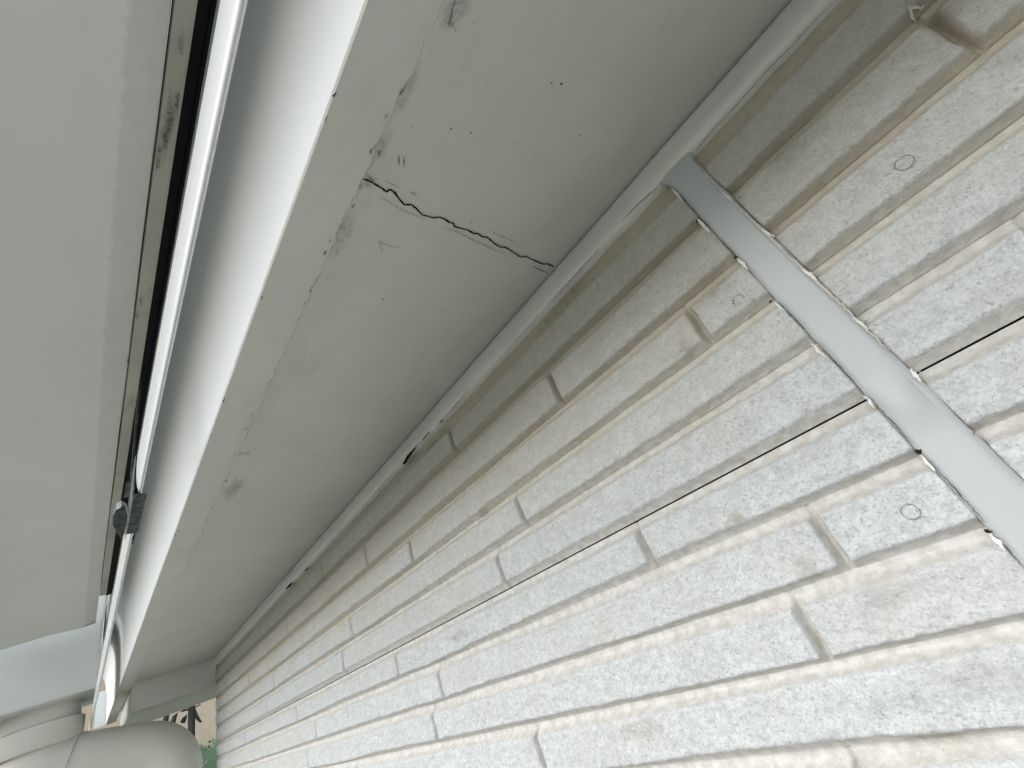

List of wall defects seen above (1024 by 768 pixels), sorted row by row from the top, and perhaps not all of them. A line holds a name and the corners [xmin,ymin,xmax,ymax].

crack [363,174,554,273]